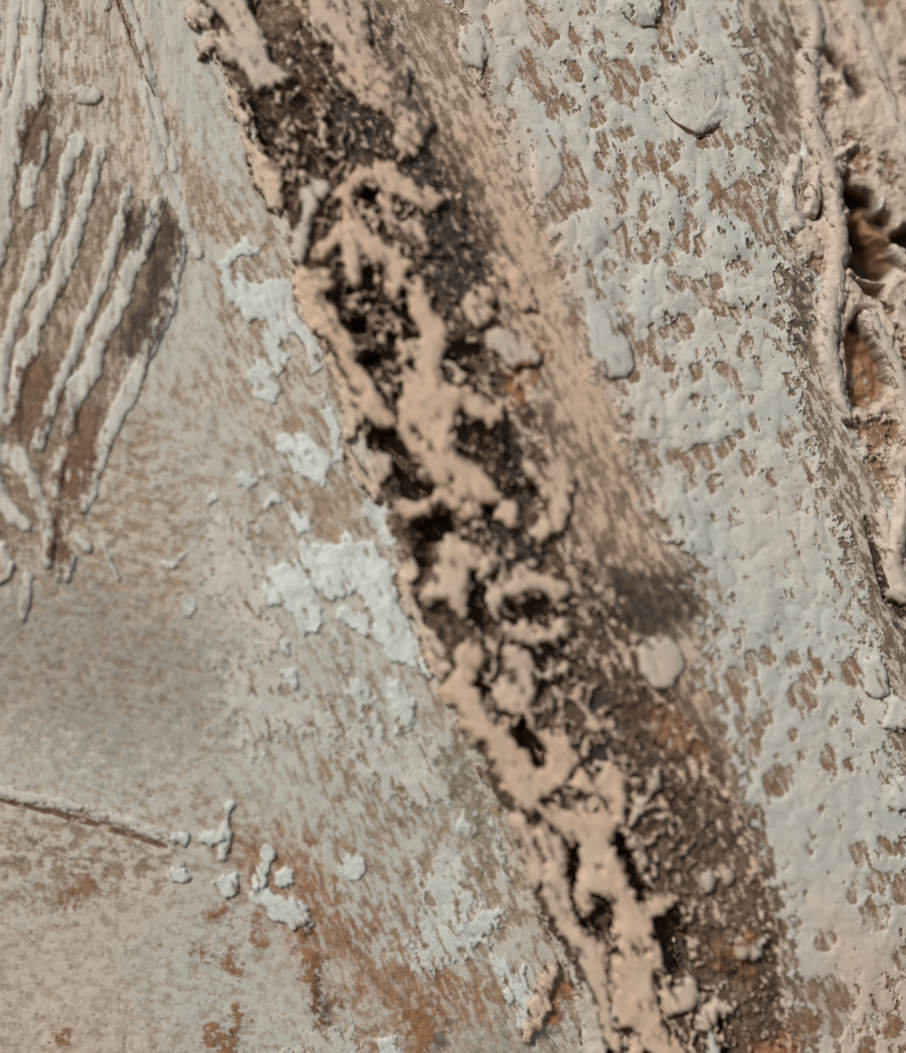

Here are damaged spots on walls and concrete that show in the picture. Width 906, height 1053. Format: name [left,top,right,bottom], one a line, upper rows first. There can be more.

peeling [166,863,192,884]
spalling [184,0,906,1053]